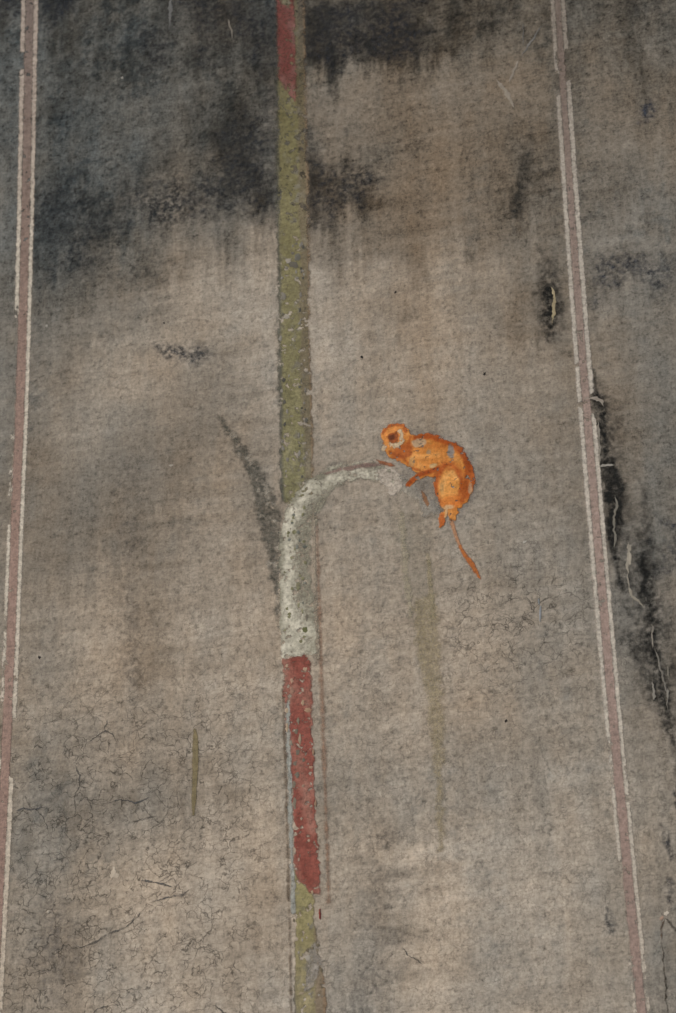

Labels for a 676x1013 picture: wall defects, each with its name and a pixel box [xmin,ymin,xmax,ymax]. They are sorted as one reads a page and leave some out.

leakage [541,271,560,341]
leakage [592,372,625,560]
leakage [617,524,675,746]
crack [109,797,155,822]
crack [78,879,189,949]
crack [660,918,676,1011]